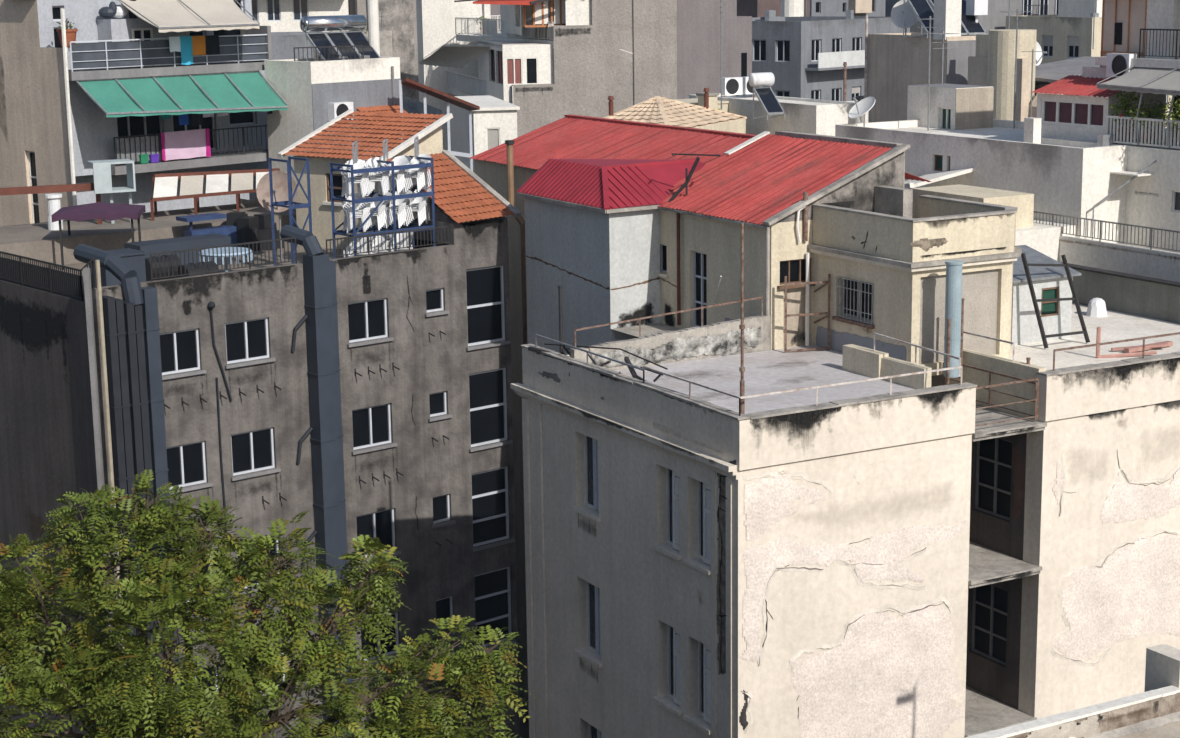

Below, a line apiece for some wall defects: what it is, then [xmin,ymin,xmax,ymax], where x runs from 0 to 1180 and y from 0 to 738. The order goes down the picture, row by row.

crack [526,255,677,290]
water stain [0,295,67,382]
water stain [752,406,843,436]
water stain [917,389,962,408]
water stain [1058,357,1180,383]
flaking render [716,460,736,675]
flaking render [1051,464,1180,667]
flaking render [739,520,966,738]